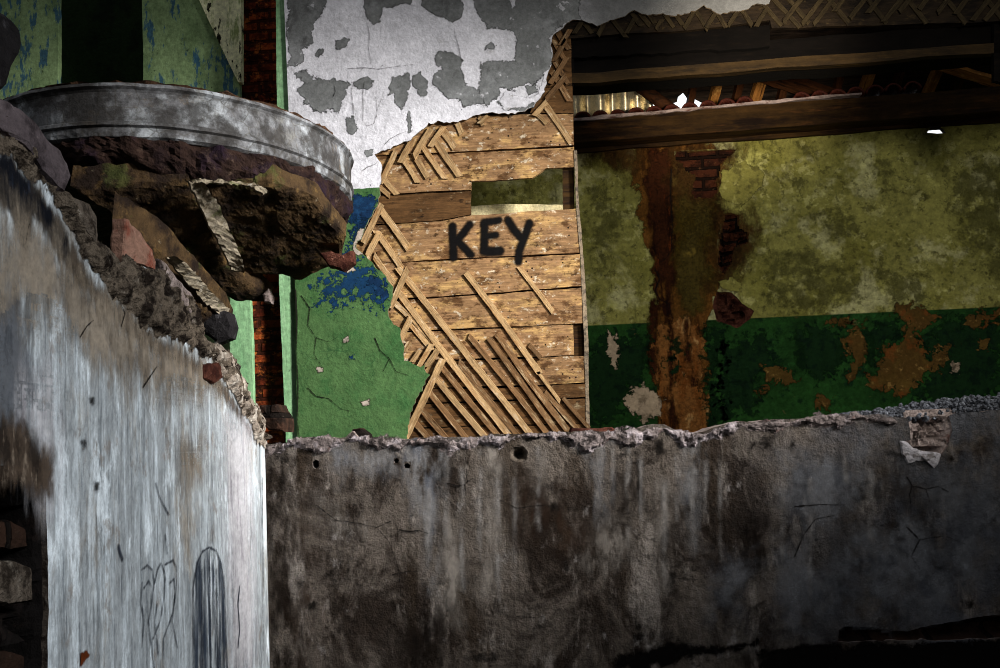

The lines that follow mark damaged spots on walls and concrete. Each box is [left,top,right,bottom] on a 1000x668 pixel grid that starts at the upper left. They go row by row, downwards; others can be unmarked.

peeling [286,0,375,135]
peeling [363,0,582,133]
damp [0,153,252,668]
crack [295,289,348,435]
spalling [0,133,962,468]
rust [630,143,724,432]
peeling [954,305,1000,352]
damp [266,463,310,638]
damp [441,524,461,625]
damp [511,475,629,572]
crack [794,504,845,557]
crack [906,477,965,569]